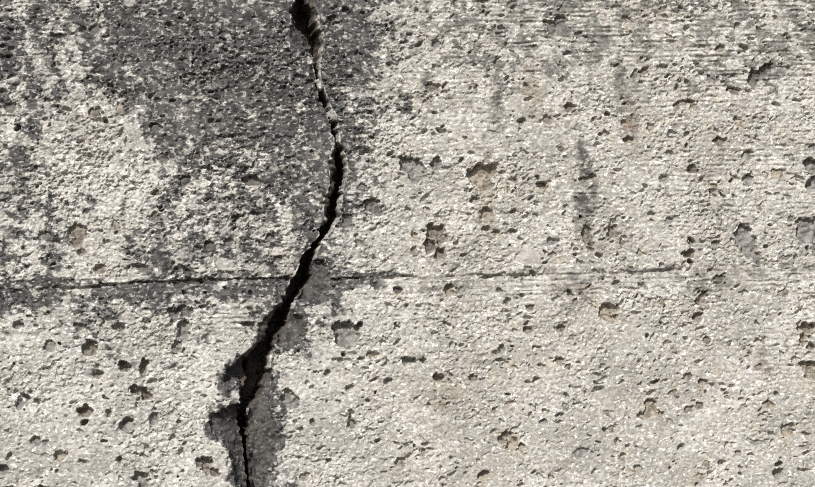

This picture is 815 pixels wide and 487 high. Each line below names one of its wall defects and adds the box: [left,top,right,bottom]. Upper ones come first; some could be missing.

leakage [0,0,411,487]
crack [209,0,355,487]